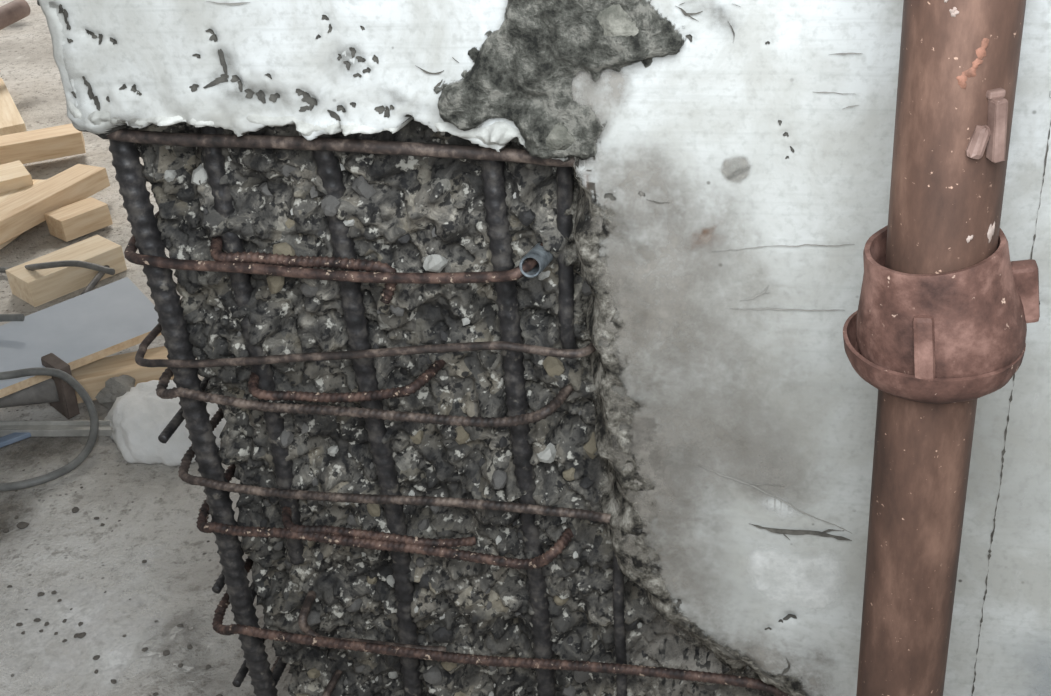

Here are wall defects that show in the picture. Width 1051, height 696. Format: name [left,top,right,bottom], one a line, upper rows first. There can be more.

spalling [189,29,280,104]
spalling [337,47,379,78]
peeling [461,47,479,77]
water stain [571,70,625,126]
crack [1031,123,1051,259]
spalling [77,89,808,696]
crack [700,465,852,541]
crack [972,374,1015,694]